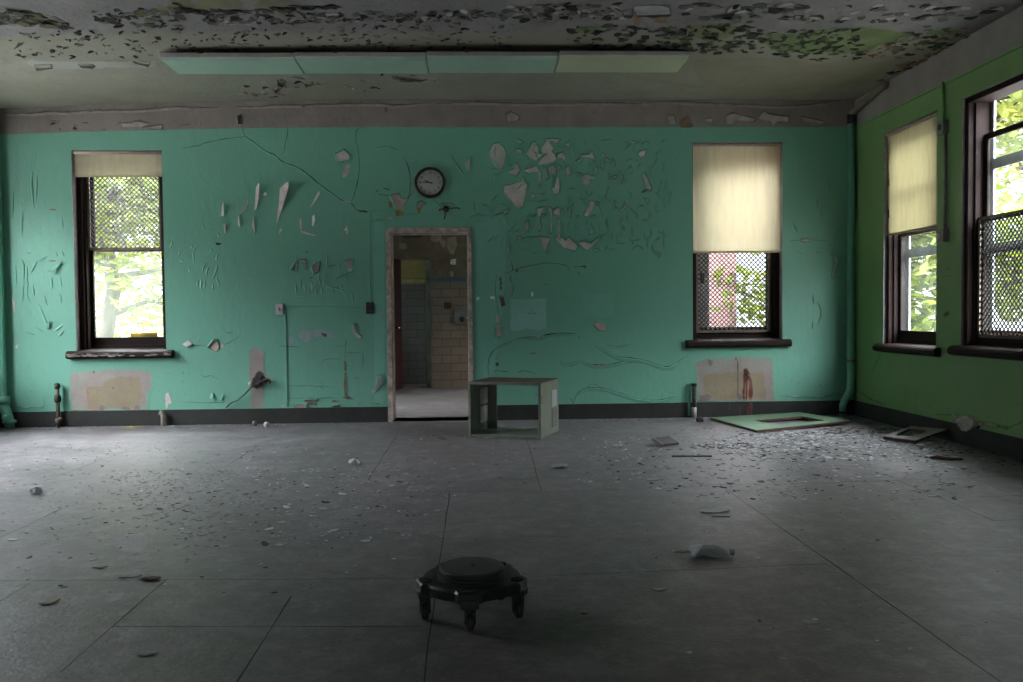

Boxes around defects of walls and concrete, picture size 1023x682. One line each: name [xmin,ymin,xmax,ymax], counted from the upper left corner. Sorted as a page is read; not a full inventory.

peeling [0,0,1005,81]
crack [4,100,847,213]
peeling [238,183,267,232]
peeling [277,182,288,234]
peeling [483,138,673,259]
flaking render [66,353,171,411]
crack [487,310,694,404]